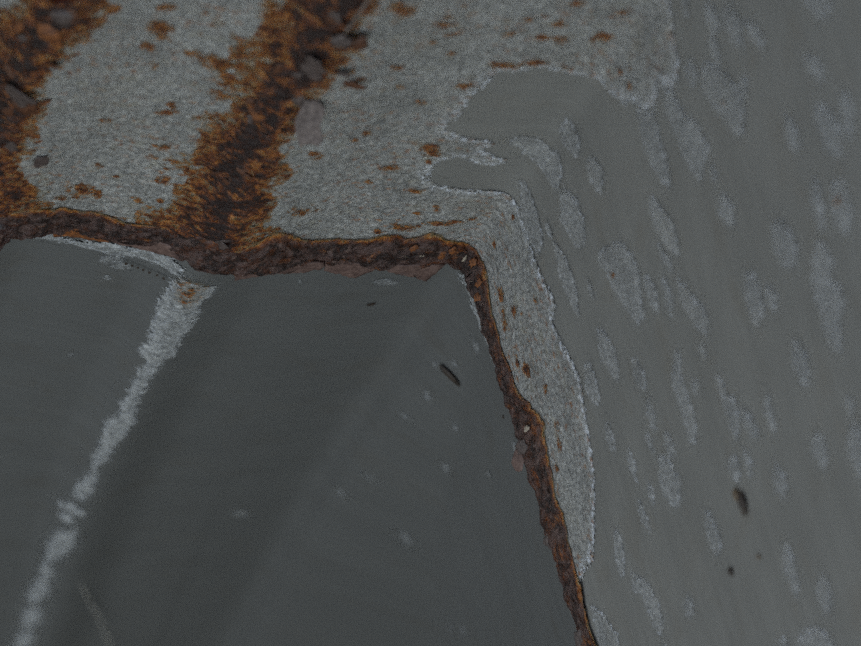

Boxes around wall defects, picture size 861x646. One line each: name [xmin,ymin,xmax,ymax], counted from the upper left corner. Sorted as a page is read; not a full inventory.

leakage [12,277,220,646]
peeling [0,0,320,229]
corrosion [0,0,620,646]
peeling [232,0,680,582]
corrosion [614,528,666,646]
corrosion [627,400,681,533]